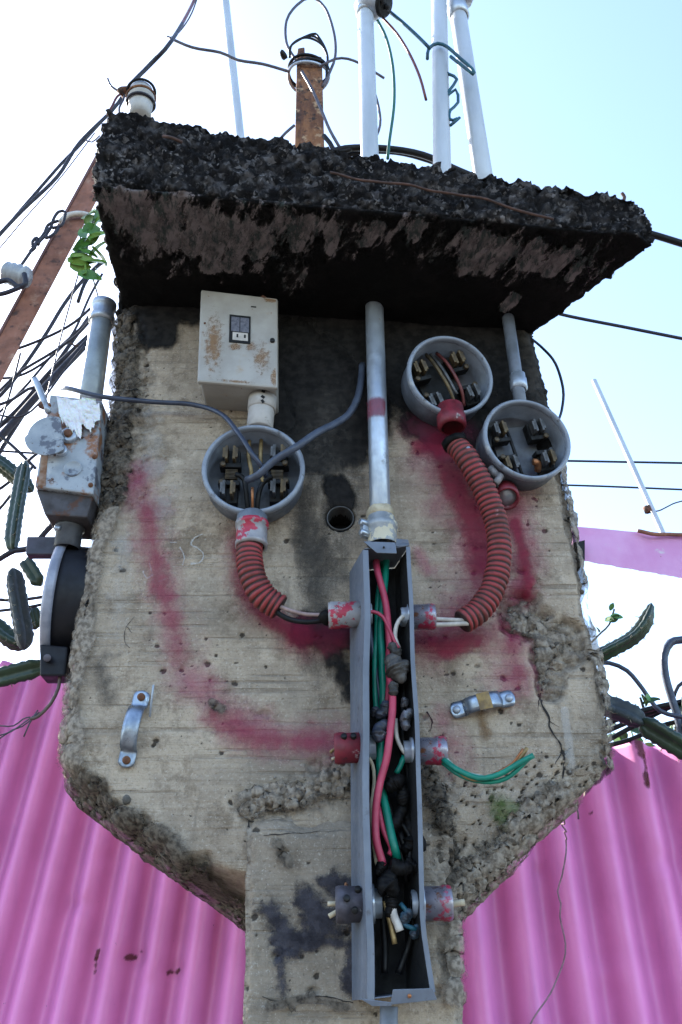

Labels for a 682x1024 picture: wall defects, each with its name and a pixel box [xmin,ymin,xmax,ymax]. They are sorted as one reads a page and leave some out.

peeling [92,185,614,313]
spalling [330,171,554,220]
spalling [57,311,246,932]
spalling [441,465,614,1007]
crack [538,668,565,779]
leakage [274,946,288,998]
leakage [339,938,352,997]